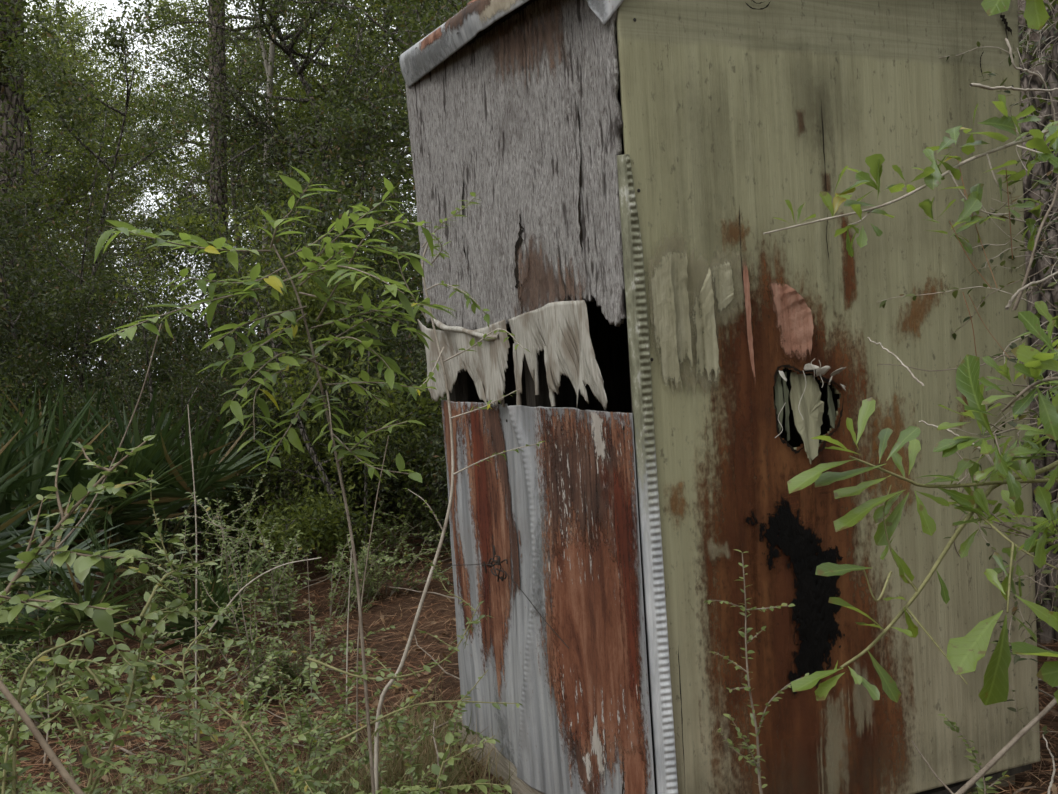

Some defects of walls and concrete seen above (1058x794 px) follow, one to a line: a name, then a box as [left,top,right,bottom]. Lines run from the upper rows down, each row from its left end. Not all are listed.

corrosion [419,0,516,51]
corrosion [841,213,857,309]
peeling [804,363,846,391]
corrosion [441,400,522,700]
corrosion [665,483,685,522]
corrosion [697,241,914,794]
corrosion [534,407,651,794]